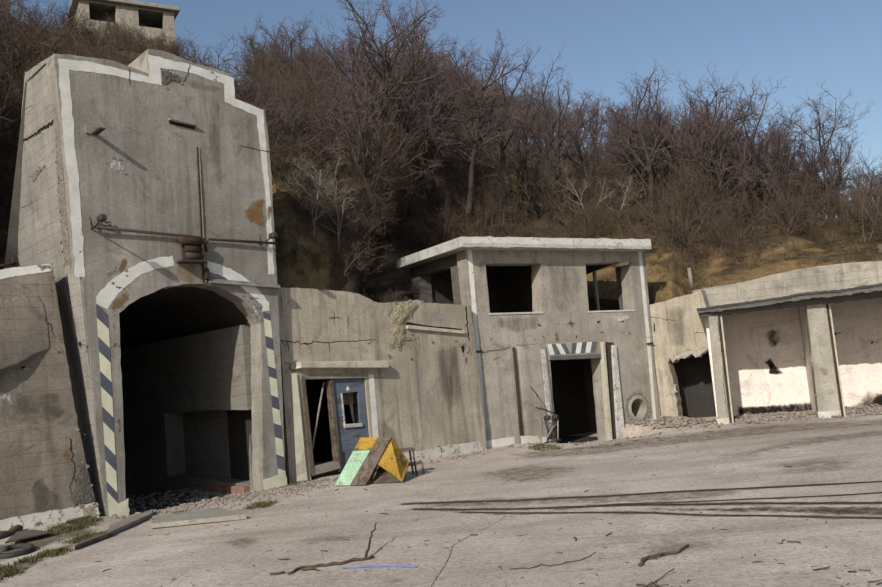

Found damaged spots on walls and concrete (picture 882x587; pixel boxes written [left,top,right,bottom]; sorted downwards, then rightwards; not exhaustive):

corrosion [247,200,271,225]
corrosion [112,294,128,309]
spalling [387,299,424,359]